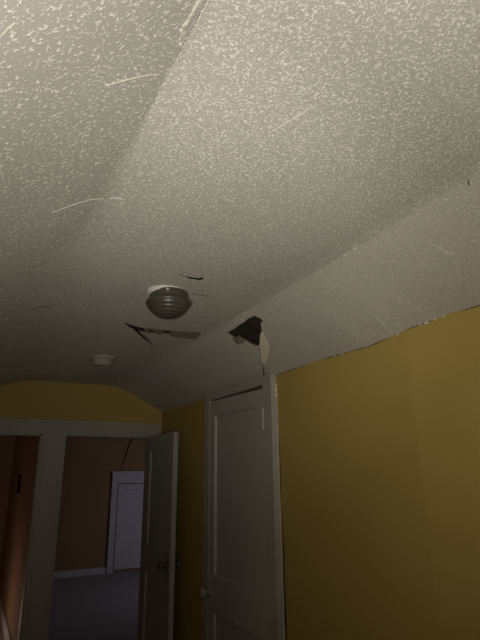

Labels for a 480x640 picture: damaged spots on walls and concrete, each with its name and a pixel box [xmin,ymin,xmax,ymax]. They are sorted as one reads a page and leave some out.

crack [125,323,201,346]
spalling [230,323,260,345]